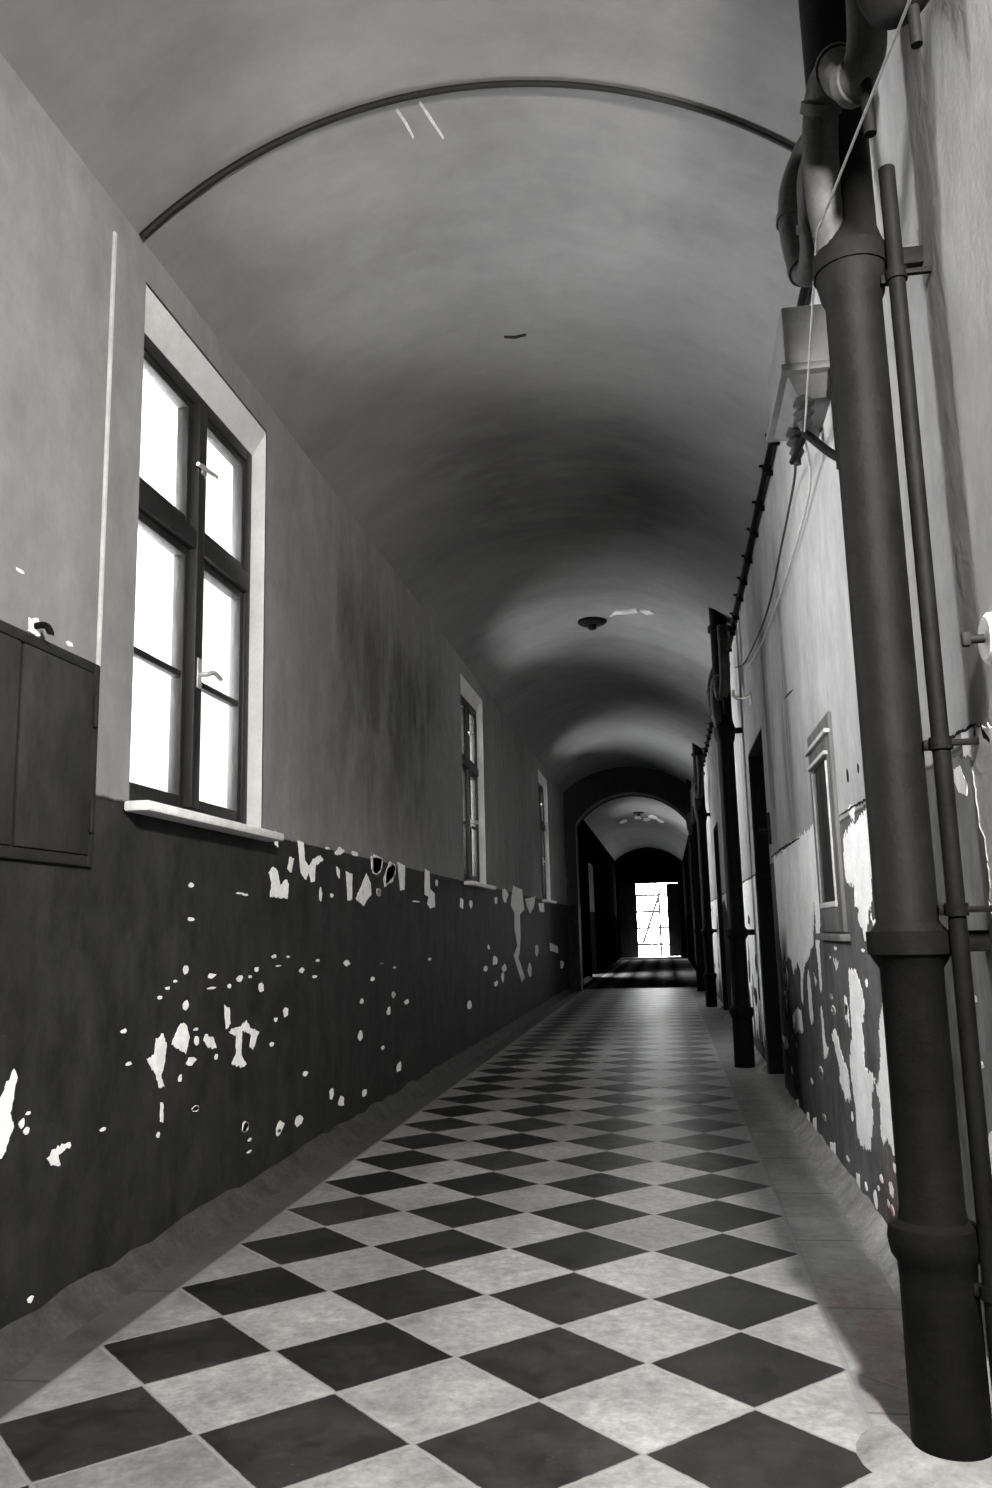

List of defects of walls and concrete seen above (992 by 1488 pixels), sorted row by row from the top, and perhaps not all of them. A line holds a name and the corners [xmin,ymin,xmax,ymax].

peeling [268,831,438,909]
peeling [484,885,564,986]
peeling [952,723,992,1173]
peeling [125,954,320,1138]
peeling [773,804,896,1216]
peeling [0,1069,31,1159]
peeling [47,1142,71,1166]